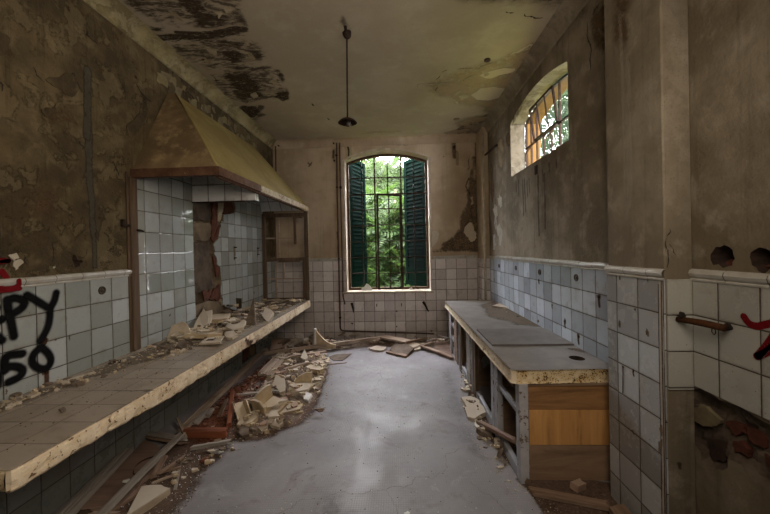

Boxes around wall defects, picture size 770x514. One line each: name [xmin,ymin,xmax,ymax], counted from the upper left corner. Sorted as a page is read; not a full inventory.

leakage [128,0,289,120]
flaking render [193,202,242,317]
flaking render [694,388,770,489]